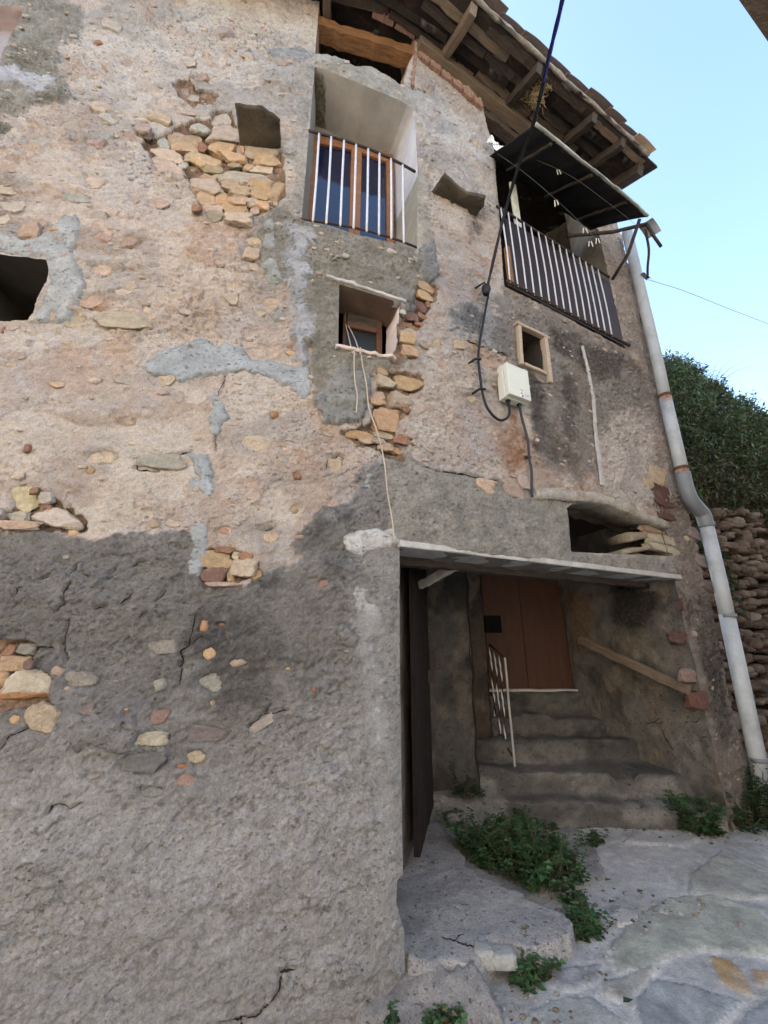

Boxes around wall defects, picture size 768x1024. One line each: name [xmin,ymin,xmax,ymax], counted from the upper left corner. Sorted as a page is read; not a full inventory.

flaking render [134,104,286,272]
flaking render [340,280,439,462]
damp [528,371,545,450]
damp [551,330,621,381]
flaking render [0,485,88,533]
flaking render [636,465,692,554]
flaking render [198,527,262,587]
crack [12,562,167,656]
flaking render [0,640,61,734]
crack [178,615,200,685]
crack [222,968,295,1024]